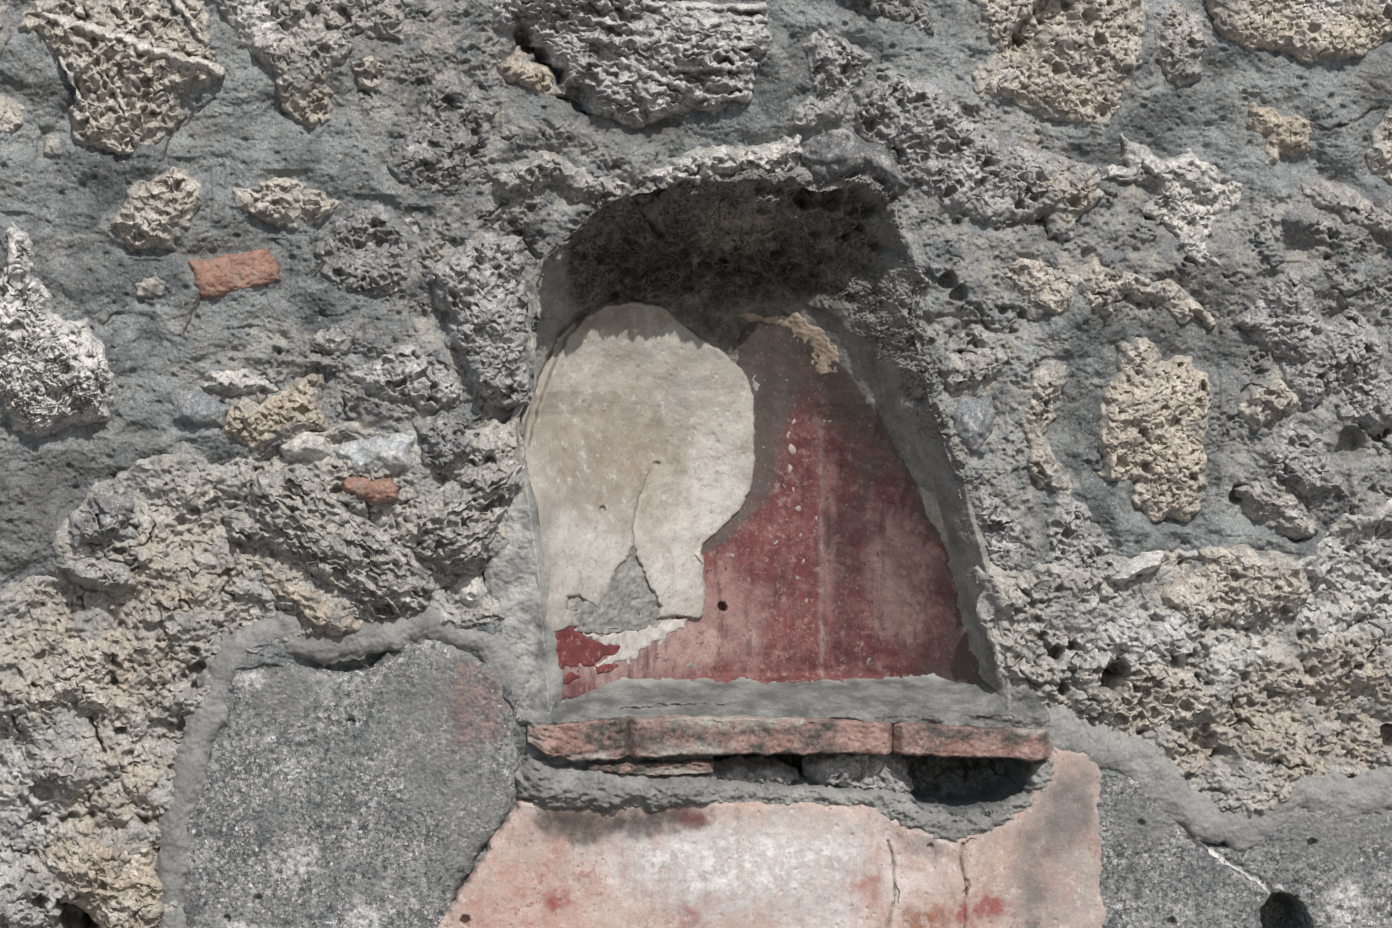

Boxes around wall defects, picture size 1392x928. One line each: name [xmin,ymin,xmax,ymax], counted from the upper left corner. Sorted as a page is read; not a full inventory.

spalling [555,547,694,685]
crack [886,842,900,927]
crack [959,837,975,928]